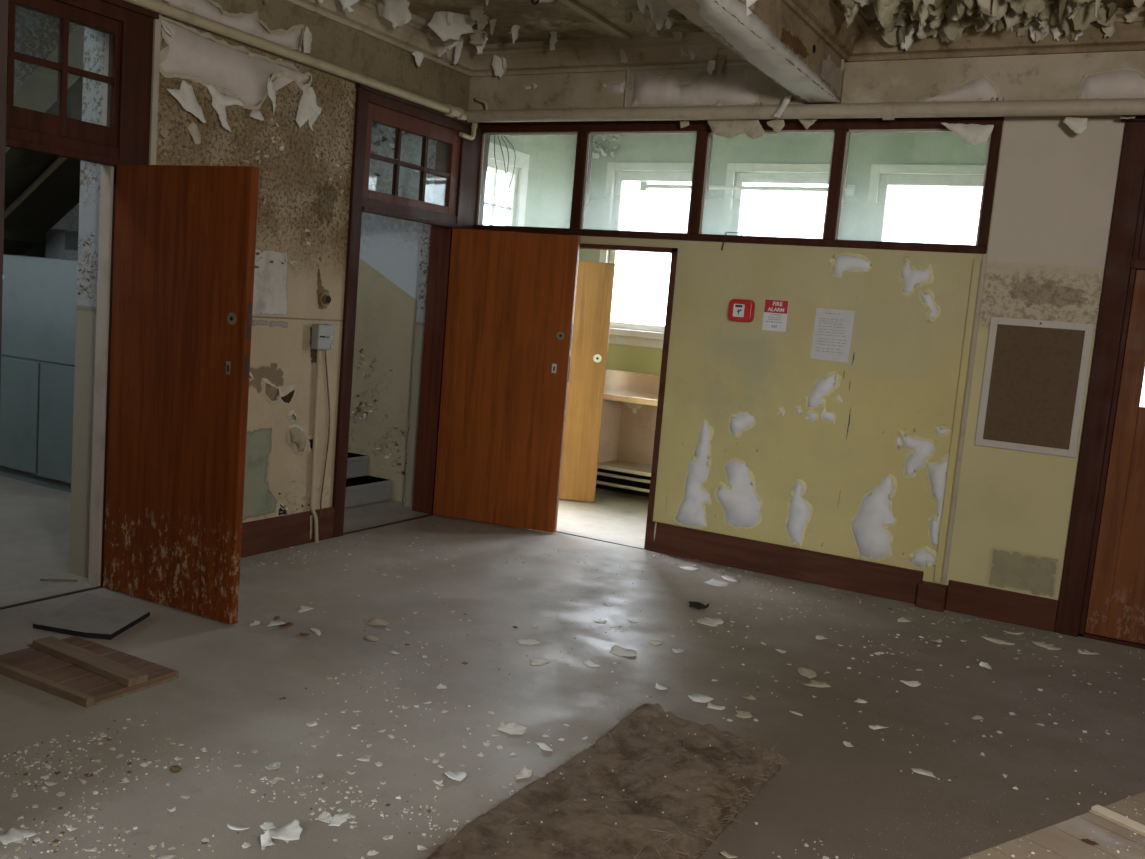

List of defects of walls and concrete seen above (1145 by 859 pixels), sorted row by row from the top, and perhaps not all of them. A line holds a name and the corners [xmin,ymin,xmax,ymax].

peeling [339,0,412,30]
peeling [411,0,507,79]
peeling [840,0,1145,51]
peeling [159,0,321,165]
peeling [828,252,873,277]
peeling [897,256,941,323]
spalling [249,372,318,456]
peeling [728,412,756,439]
peeling [777,371,843,424]
peeling [673,419,763,529]
peeling [784,479,813,547]
peeling [849,424,951,570]